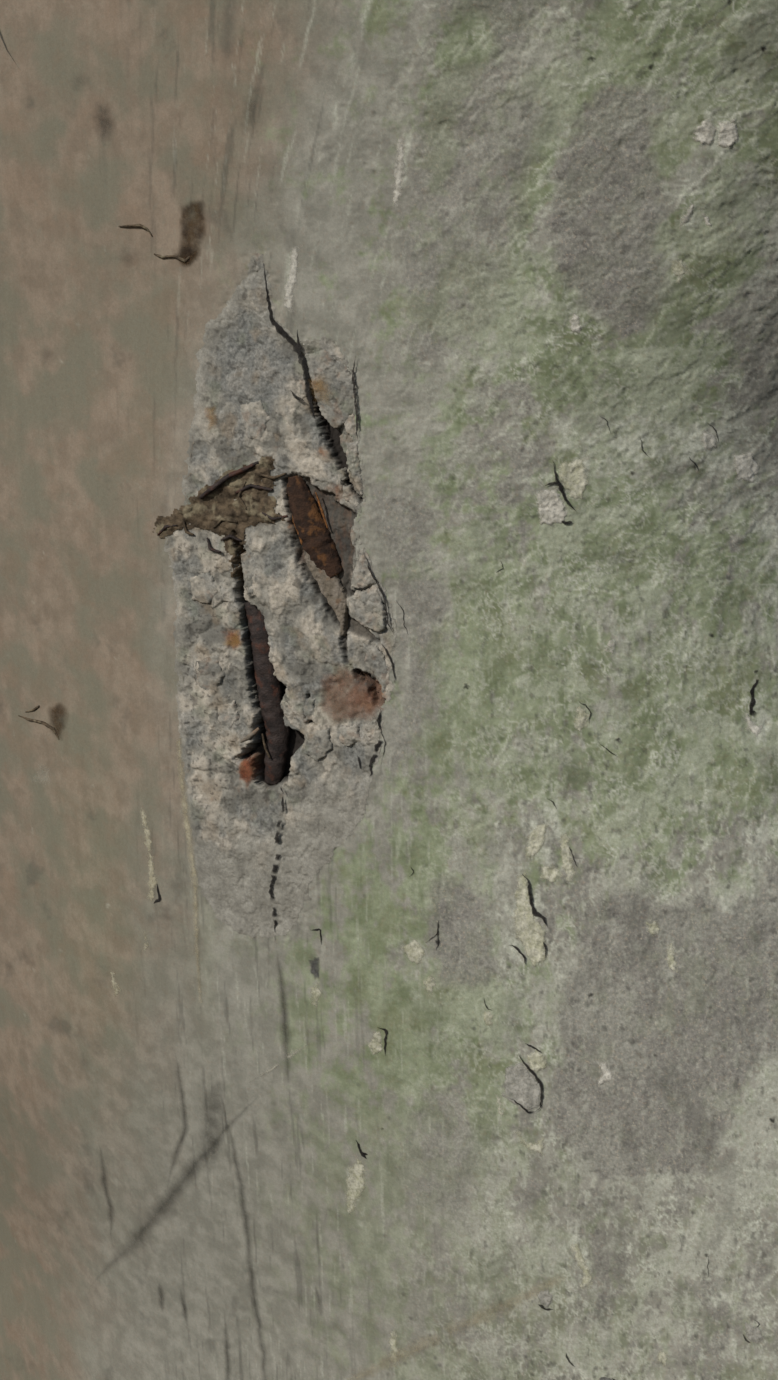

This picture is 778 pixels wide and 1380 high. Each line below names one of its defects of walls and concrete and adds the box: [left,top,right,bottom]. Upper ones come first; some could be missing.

crack [263,263,315,418]
crack [351,357,359,439]
peeling [537,459,588,525]
spalling [164,248,398,938]
crack [352,552,408,682]
crack [357,713,386,776]
peeling [497,1043,546,1115]